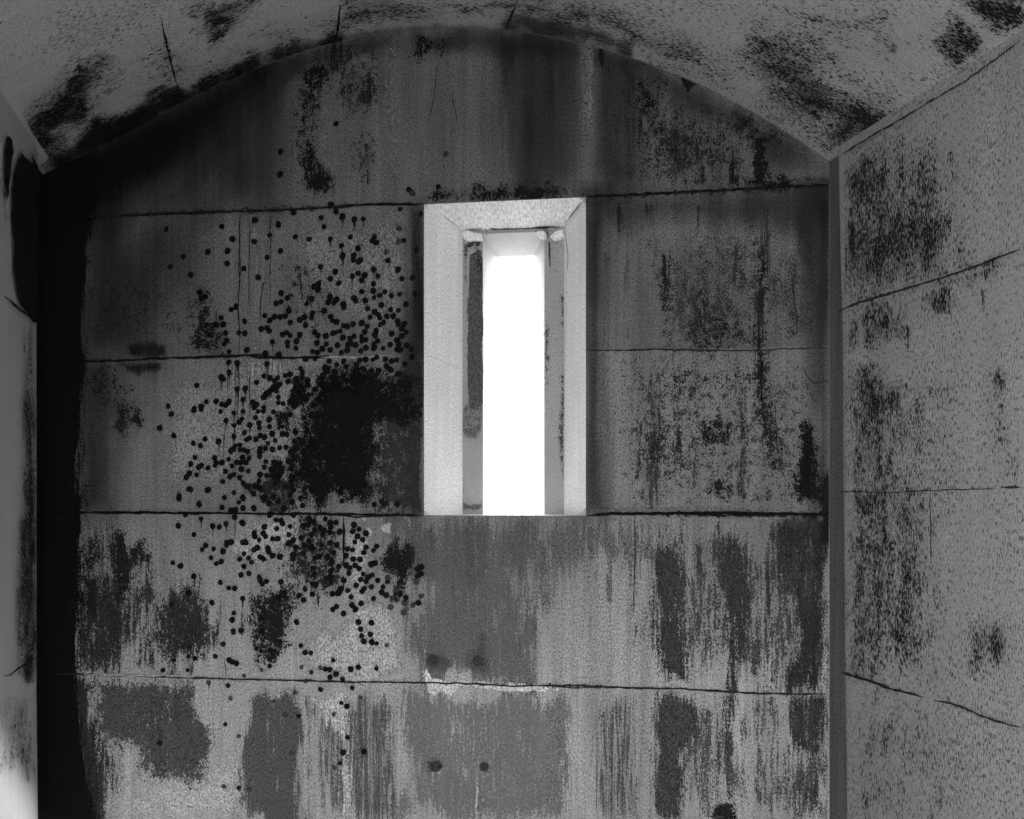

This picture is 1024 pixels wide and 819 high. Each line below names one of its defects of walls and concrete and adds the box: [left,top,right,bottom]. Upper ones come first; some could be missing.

crack [161,18,177,84]
damp [424,42,572,203]
damp [327,243,364,286]
damp [395,248,423,335]
damp [275,330,303,358]
damp [843,126,1003,819]
damp [200,490,257,566]
damp [355,619,389,648]
damp [223,657,239,688]
damp [309,658,345,682]
crack [842,672,1019,727]
damp [590,696,640,819]